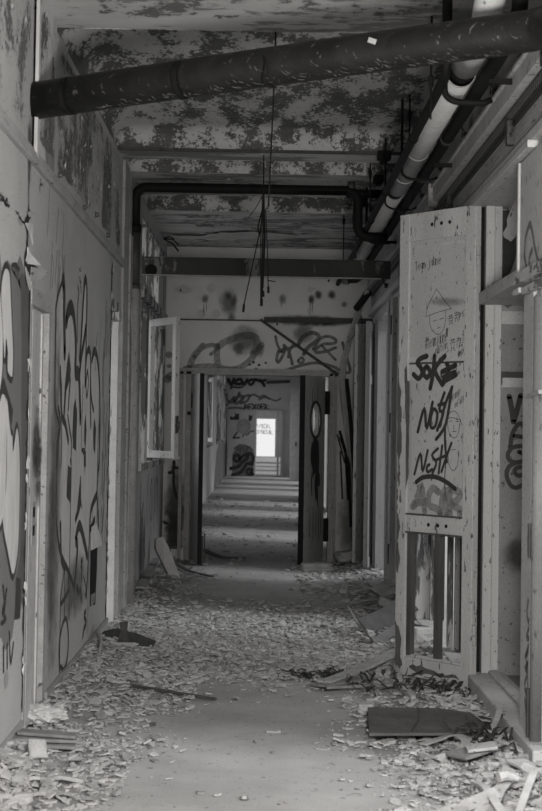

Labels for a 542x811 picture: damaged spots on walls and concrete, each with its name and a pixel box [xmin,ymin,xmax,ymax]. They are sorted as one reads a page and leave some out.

peeling [0,0,31,117]
peeling [98,0,204,19]
peeling [41,13,346,79]
peeling [39,64,440,249]